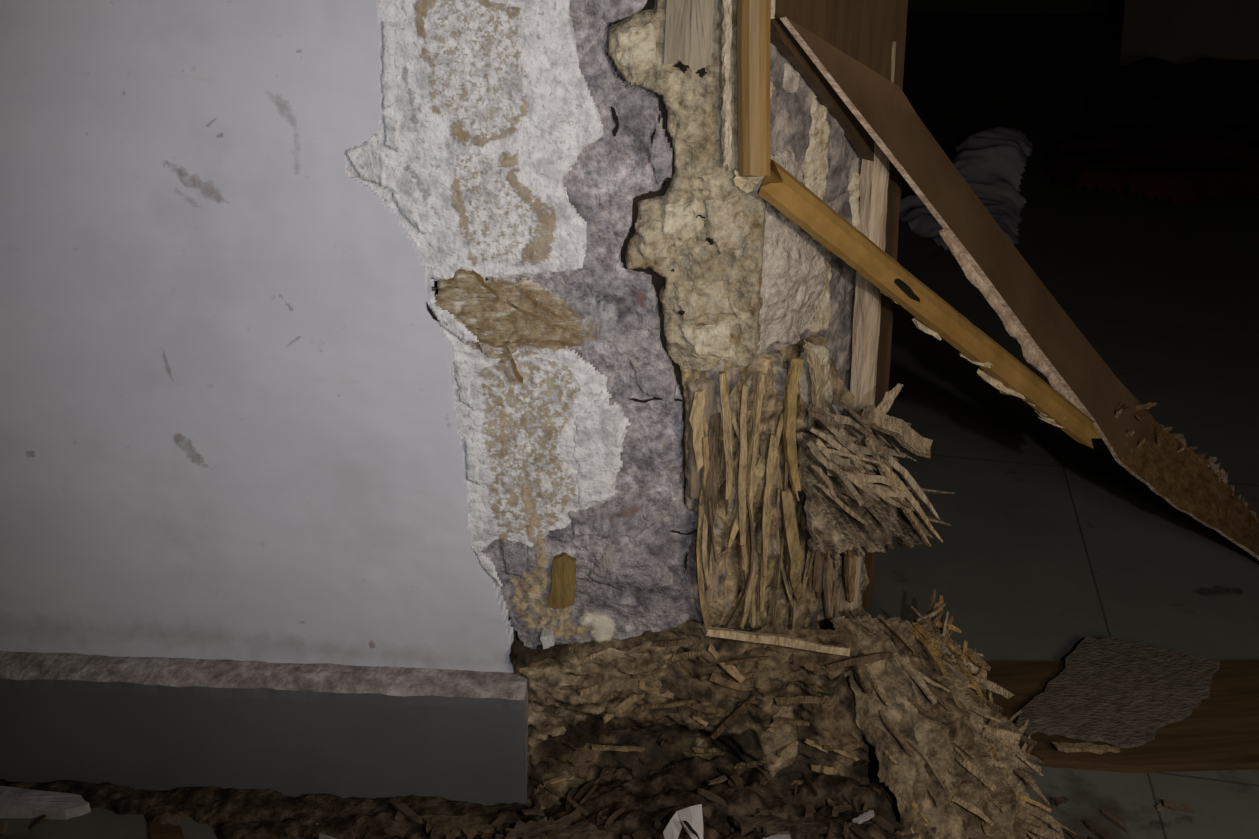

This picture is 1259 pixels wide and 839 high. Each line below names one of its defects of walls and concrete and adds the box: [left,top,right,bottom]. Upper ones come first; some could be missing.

spalling [346,0,862,650]